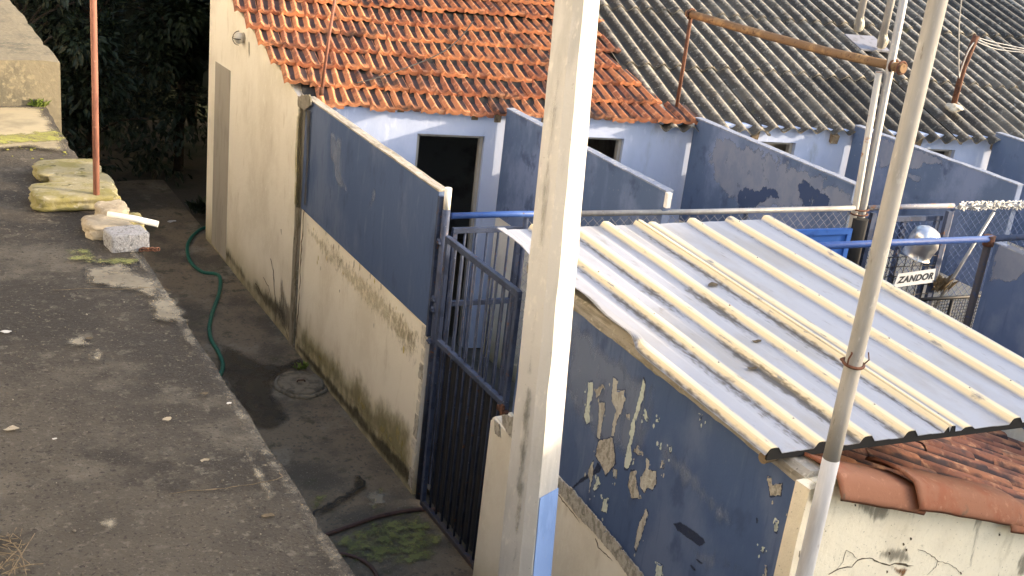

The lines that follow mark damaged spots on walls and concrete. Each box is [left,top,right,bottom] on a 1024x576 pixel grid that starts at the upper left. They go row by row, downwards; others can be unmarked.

damp [256,286,296,335]
peeling [558,376,672,576]
peeling [767,475,783,504]
crack [829,550,959,575]